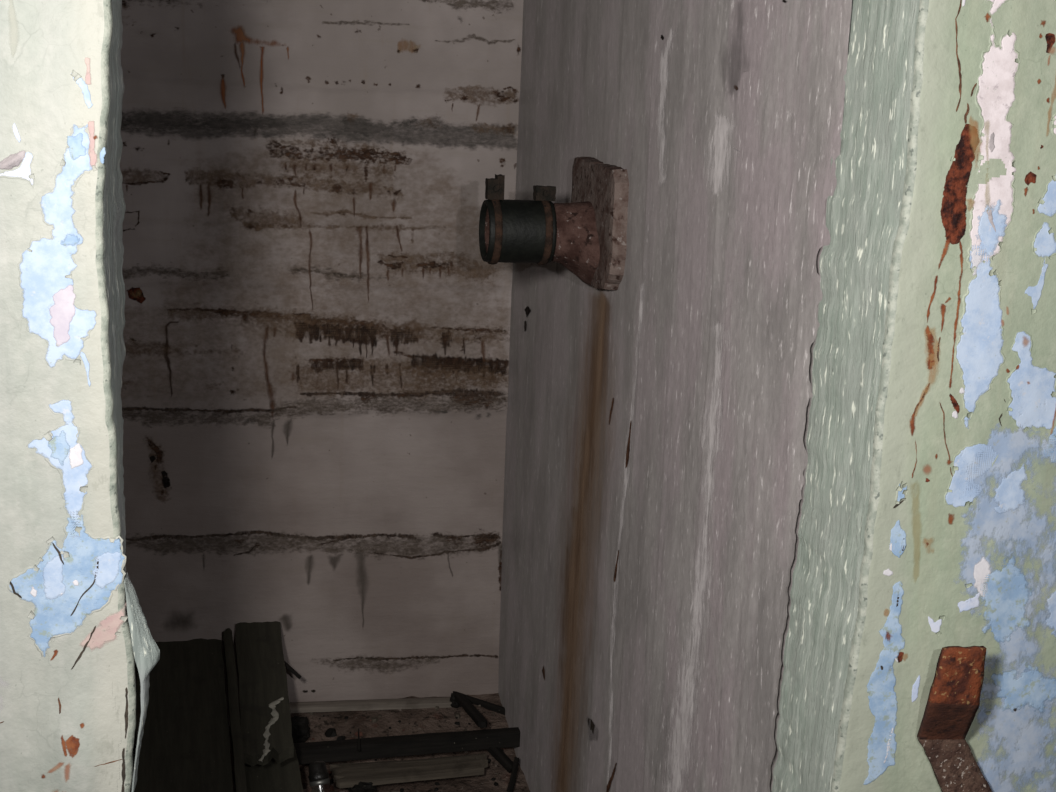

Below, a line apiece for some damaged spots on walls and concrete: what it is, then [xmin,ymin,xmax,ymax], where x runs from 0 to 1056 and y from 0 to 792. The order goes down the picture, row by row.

rust [232,27,289,112]
leakage [448,0,513,9]
rust [1039,21,1055,65]
leakage [121,111,517,148]
rust [1024,166,1040,196]
peeling [0,121,106,387]
rust [910,83,979,482]
peeling [944,0,1056,792]
peeling [889,481,908,558]
peeling [7,399,160,792]
peeling [928,615,945,636]
peeling [863,569,905,785]